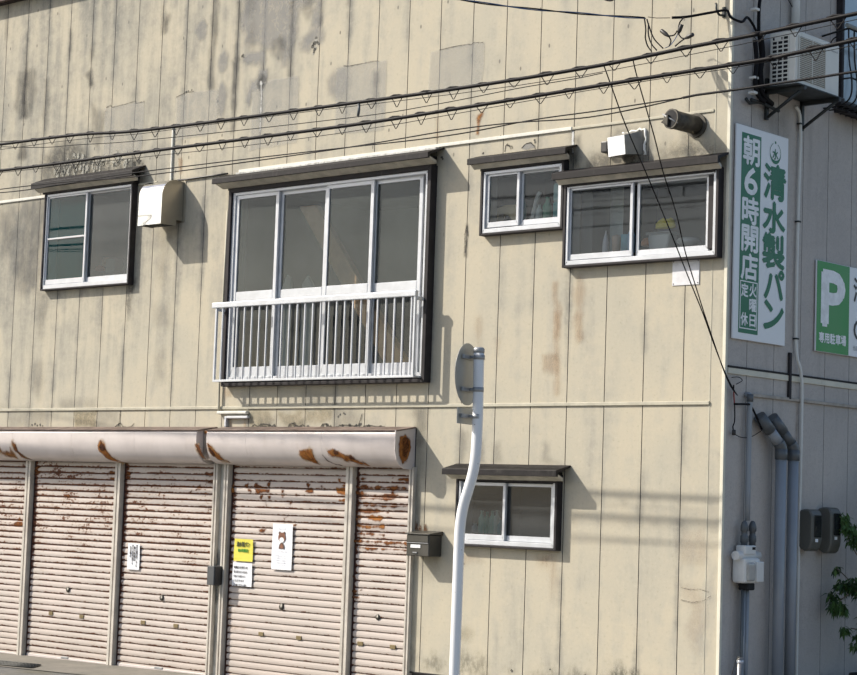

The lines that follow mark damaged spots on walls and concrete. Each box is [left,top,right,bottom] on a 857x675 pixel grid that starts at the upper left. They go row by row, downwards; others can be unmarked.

leakage [242,0,302,129]
rust [0,443,41,475]
rust [98,441,132,482]
rust [195,431,226,461]
rust [245,481,322,504]
rust [336,477,409,551]